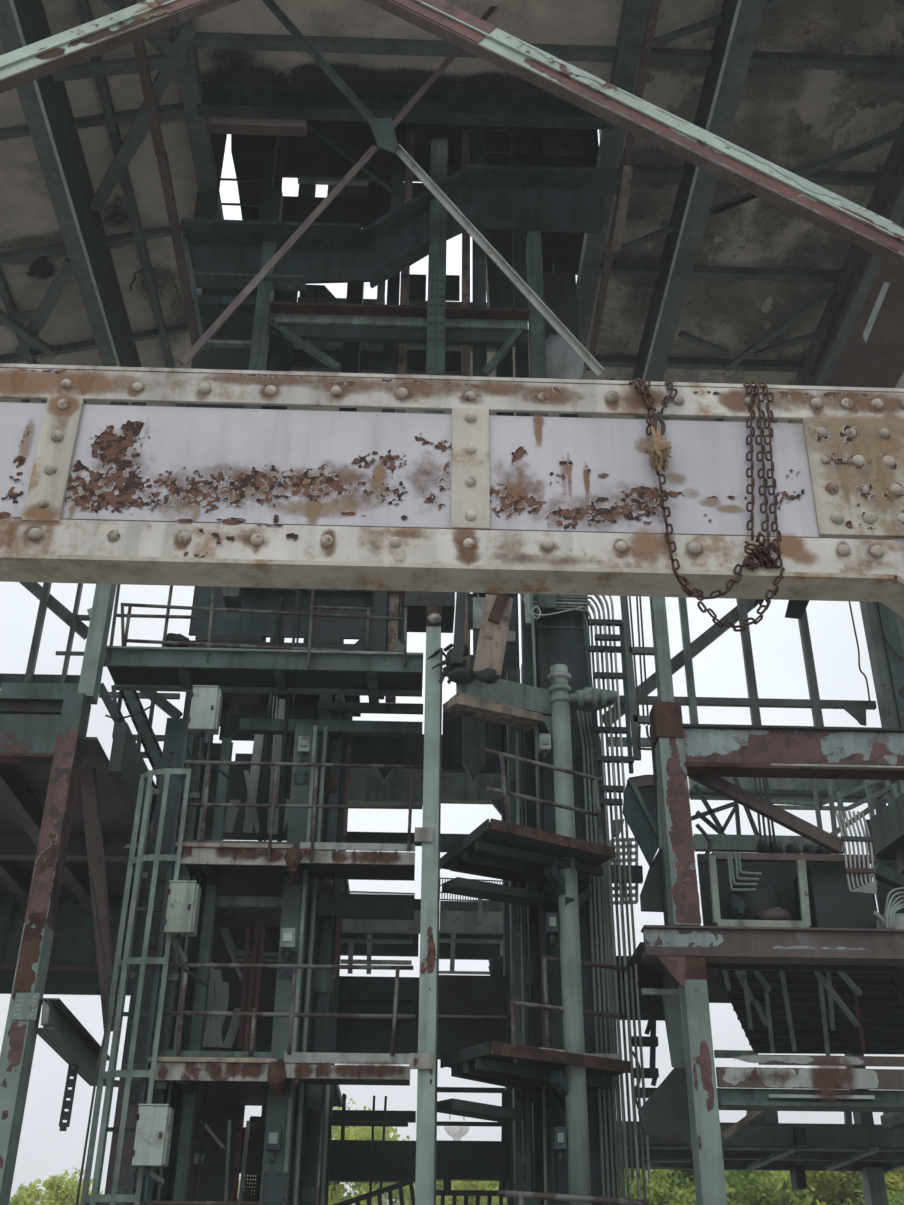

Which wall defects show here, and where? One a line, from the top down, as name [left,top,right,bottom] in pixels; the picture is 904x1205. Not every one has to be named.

rust [0,420,452,558]
rust [198,374,684,564]
rust [693,390,904,531]
peeling [683,729,769,757]
rust [217,848,283,862]
rust [665,737,701,924]
rust [12,832,58,1001]
rust [185,1062,263,1079]
rust [295,1062,405,1085]
rust [692,1041,714,1113]
peeling [723,1067,754,1086]
peeling [839,1056,879,1089]